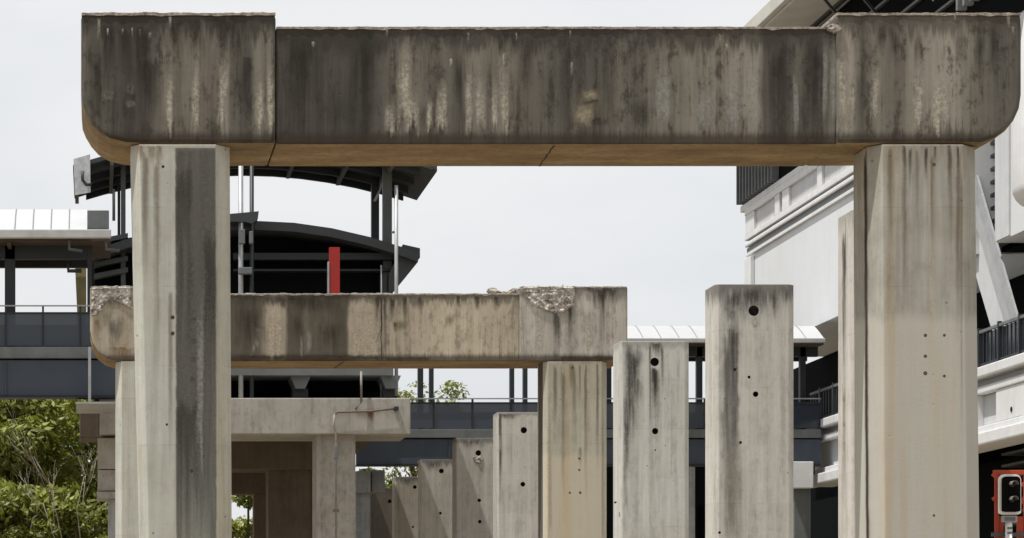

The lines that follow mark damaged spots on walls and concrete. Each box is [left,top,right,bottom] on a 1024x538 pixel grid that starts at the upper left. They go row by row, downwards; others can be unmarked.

damp [219,74,227,126]
damp [257,78,273,130]
damp [387,63,446,132]
damp [459,79,508,131]
damp [915,86,947,134]
spalling [90,286,133,316]
spalling [518,286,575,314]
damp [170,148,216,538]
damp [241,297,429,360]
damp [555,307,613,360]
damp [629,343,663,411]
damp [725,341,733,392]